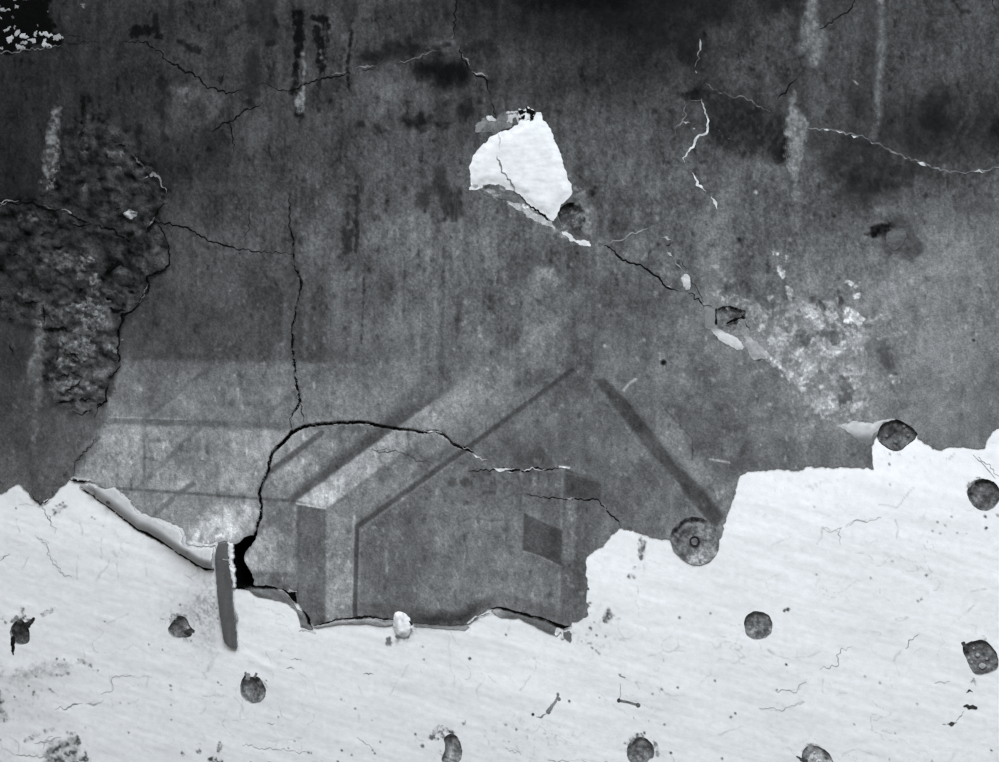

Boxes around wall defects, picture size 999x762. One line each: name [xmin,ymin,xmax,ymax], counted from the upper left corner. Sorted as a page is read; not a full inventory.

peeling [0,0,63,55]
damp [40,107,62,189]
crack [123,40,372,153]
crack [399,0,553,222]
peeling [475,107,535,133]
crack [604,227,750,329]
damp [27,306,46,450]
crack [0,197,621,535]
flaking render [70,476,218,571]
flaking render [237,585,409,645]
flaking render [409,607,572,642]
flaking render [20,730,88,762]